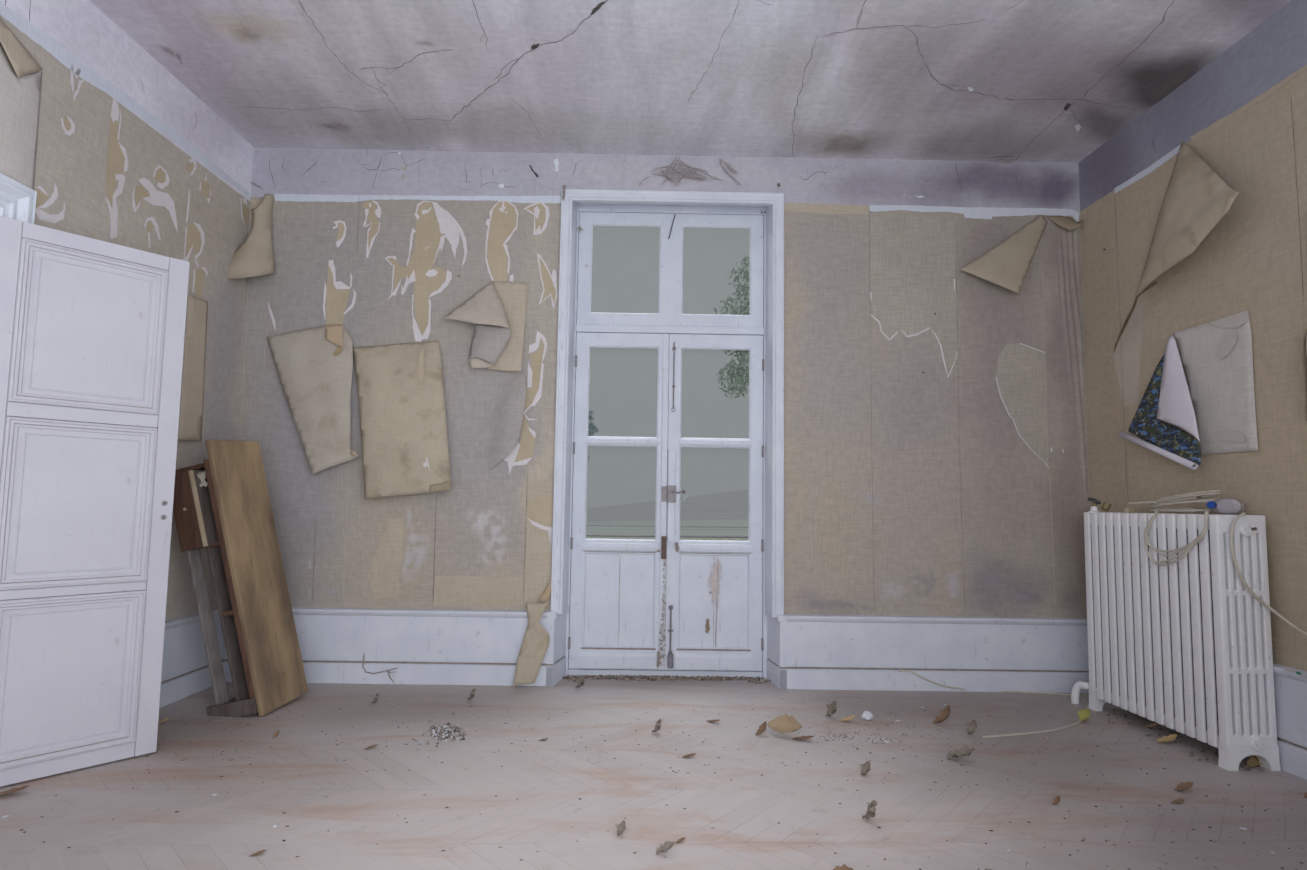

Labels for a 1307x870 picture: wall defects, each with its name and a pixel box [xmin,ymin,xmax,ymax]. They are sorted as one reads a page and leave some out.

crack [244,0,608,193]
crack [688,0,773,102]
crack [789,0,1174,184]
leakage [1144,57,1200,106]
peeling [34,189,48,207]
peeling [105,119,125,207]
peeling [134,168,166,207]
peeling [326,264,350,325]
peeling [387,202,446,335]
peeling [487,184,546,281]
peeling [515,338,544,462]